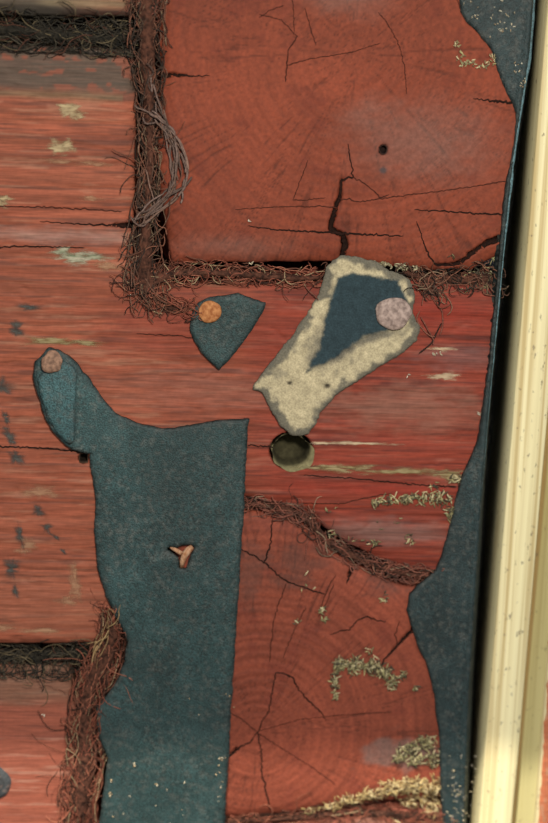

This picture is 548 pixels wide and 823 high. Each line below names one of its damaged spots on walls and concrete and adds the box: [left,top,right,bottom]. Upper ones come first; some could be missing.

crack [235,145,506,271]